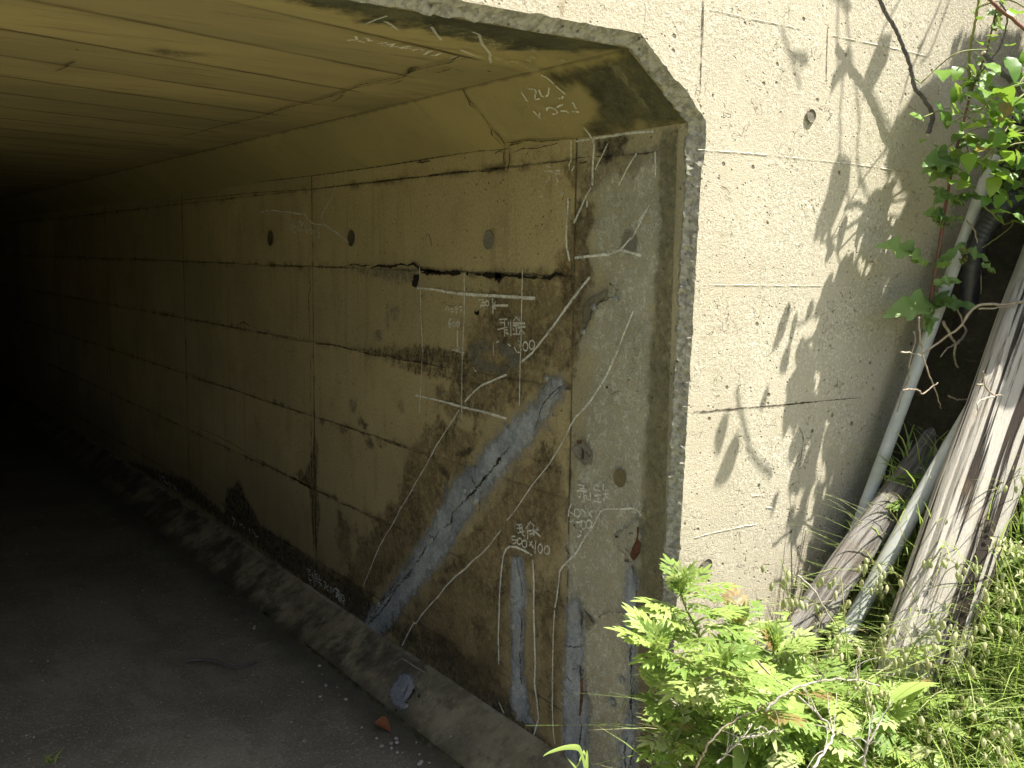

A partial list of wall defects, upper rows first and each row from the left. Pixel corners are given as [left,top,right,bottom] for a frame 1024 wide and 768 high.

crack [341,425,436,459]
damp [129,0,685,622]